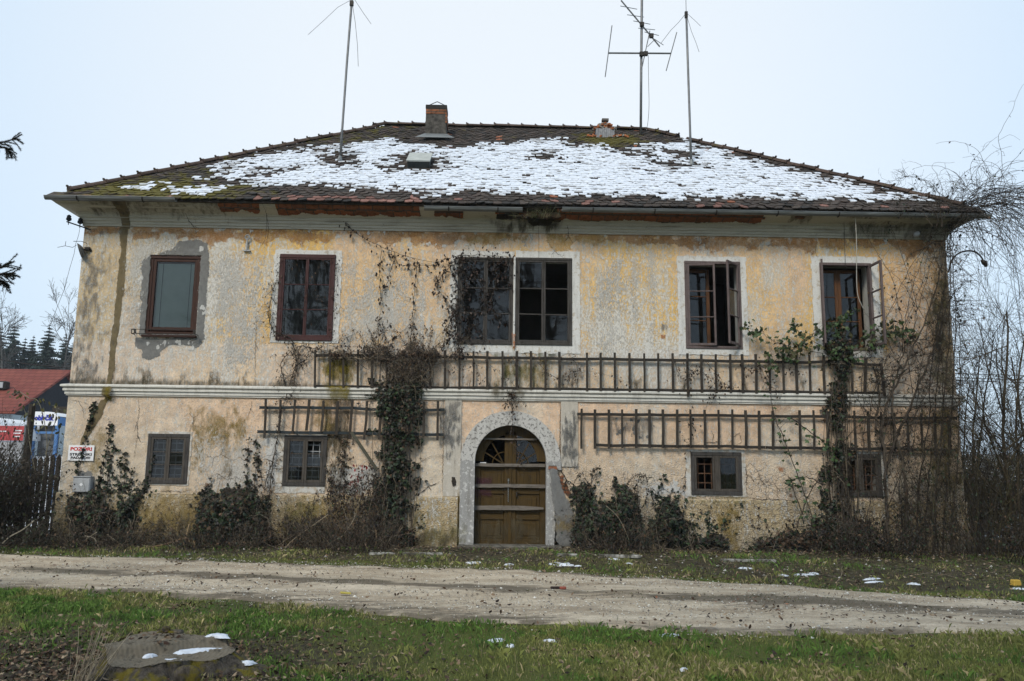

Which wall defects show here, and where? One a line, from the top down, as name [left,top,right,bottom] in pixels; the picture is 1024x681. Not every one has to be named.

spalling [217,203,260,214]
spalling [275,204,421,217]
spalling [434,211,463,219]
peeling [78,251,112,350]
water stain [71,201,130,445]
peeling [88,228,340,385]
spalling [495,205,933,363]
spalling [548,465,572,498]